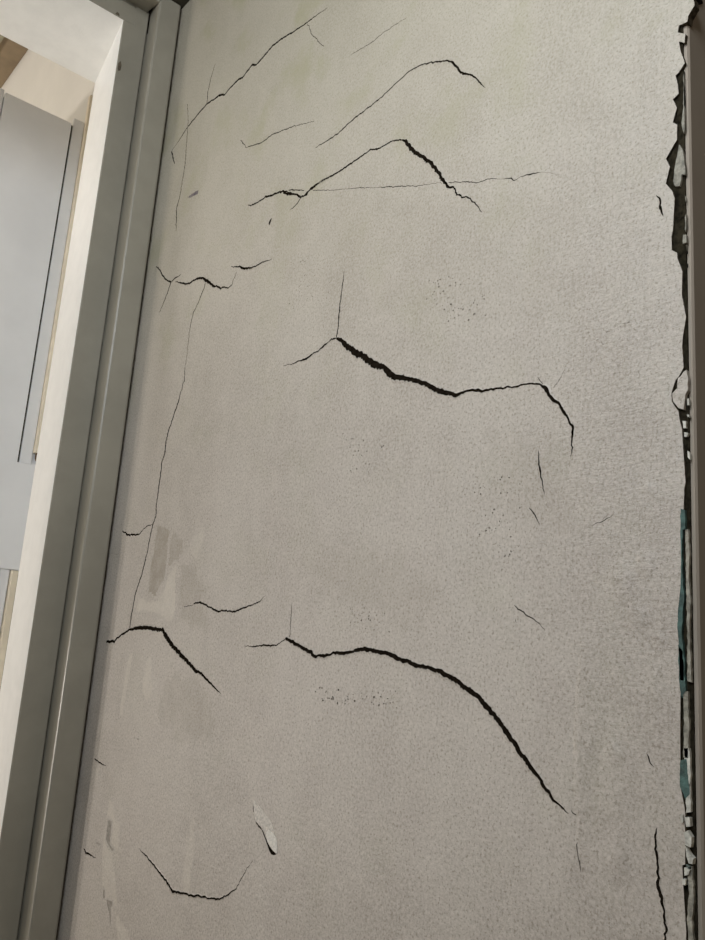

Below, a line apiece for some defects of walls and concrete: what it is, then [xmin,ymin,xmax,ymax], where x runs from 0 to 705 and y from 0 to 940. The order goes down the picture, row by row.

crack [351,17,407,55]
crack [171,8,327,229]
crack [241,59,485,148]
crack [248,138,553,212]
crack [283,275,575,454]
crack [106,259,271,694]
crack [529,451,544,525]
flaking render [667,69,698,940]
crack [244,605,576,815]
crack [140,849,253,901]
flaking render [253,801,277,855]
crack [653,828,670,940]